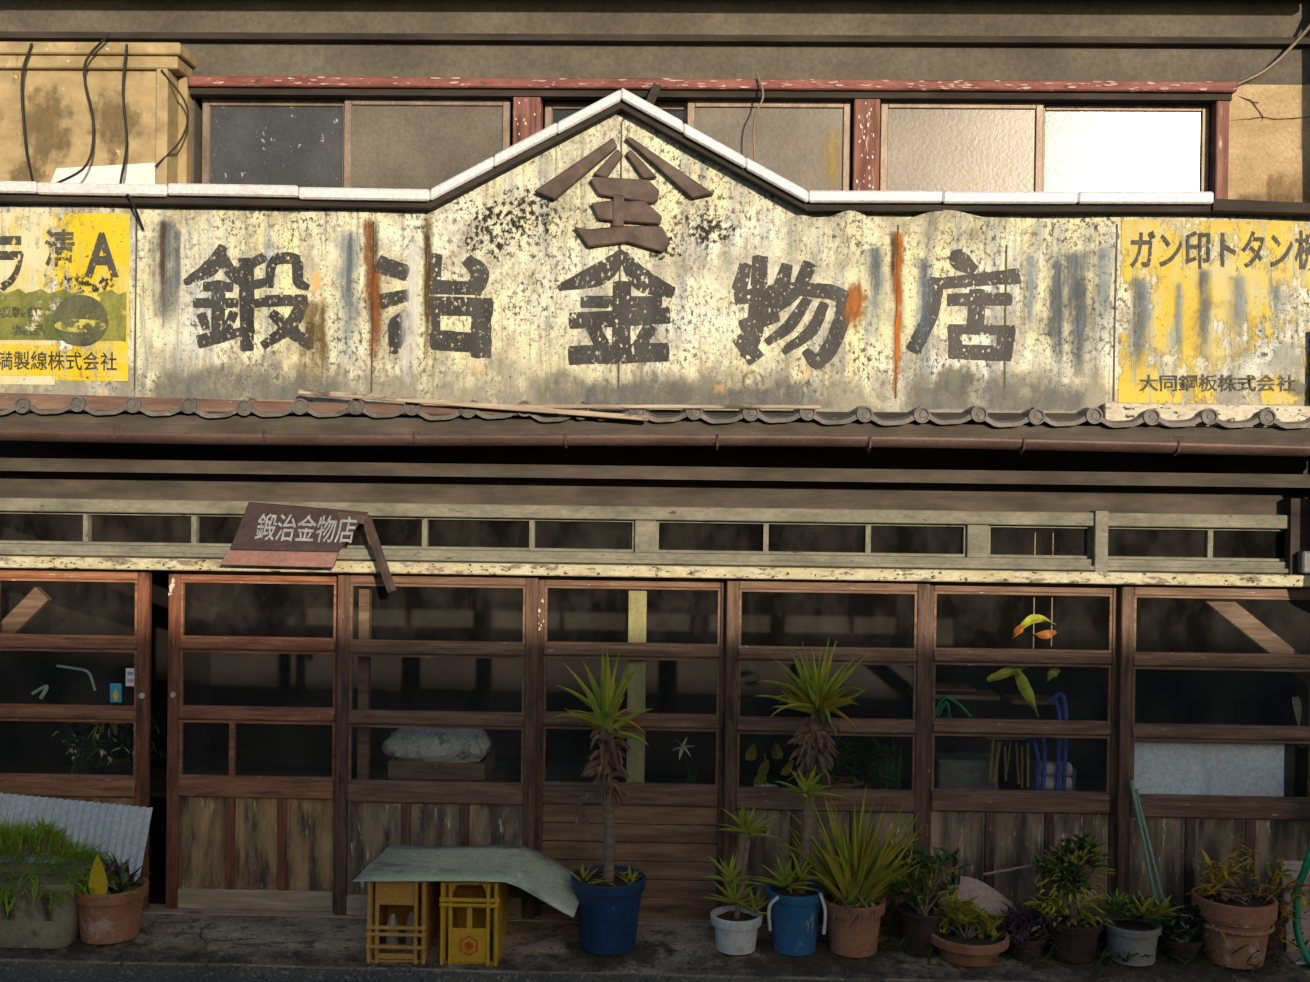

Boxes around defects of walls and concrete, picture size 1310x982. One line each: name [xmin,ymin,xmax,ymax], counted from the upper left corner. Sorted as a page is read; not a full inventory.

crack [1231,96,1310,121]
corrosion [364,221,381,342]
corrosion [845,283,867,326]
corrosion [891,233,903,383]
peeling [1134,280,1149,352]
peeling [1200,270,1210,338]
peeling [1235,277,1246,319]